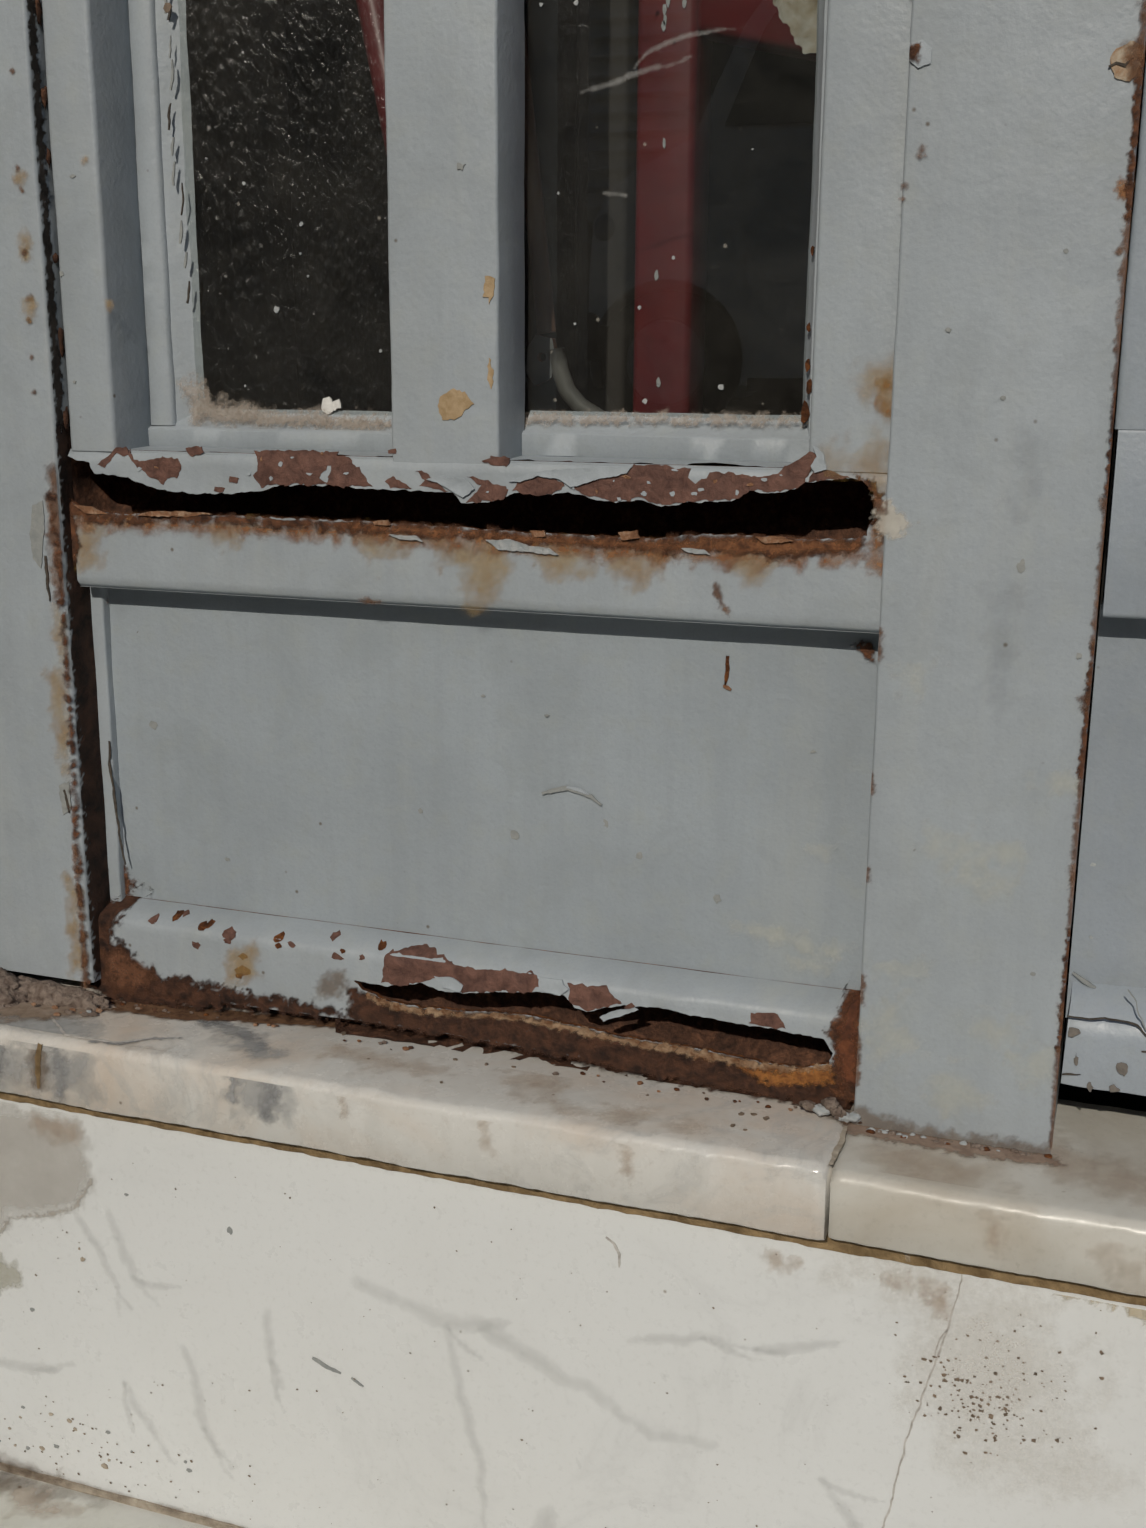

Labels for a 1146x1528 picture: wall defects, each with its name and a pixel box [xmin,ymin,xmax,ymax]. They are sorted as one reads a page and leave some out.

peeling [1109,41,1144,82]
peeling [483,276,495,303]
peeling [438,388,474,420]
spalling [70,446,878,555]
rust [1049,0,1146,1148]
rust [29,422,908,1124]
peeling [148,910,251,979]
peeling [273,931,296,949]
peeling [1068,1027,1081,1066]
peeling [1087,1062,1128,1092]
crack [882,1274,962,1528]